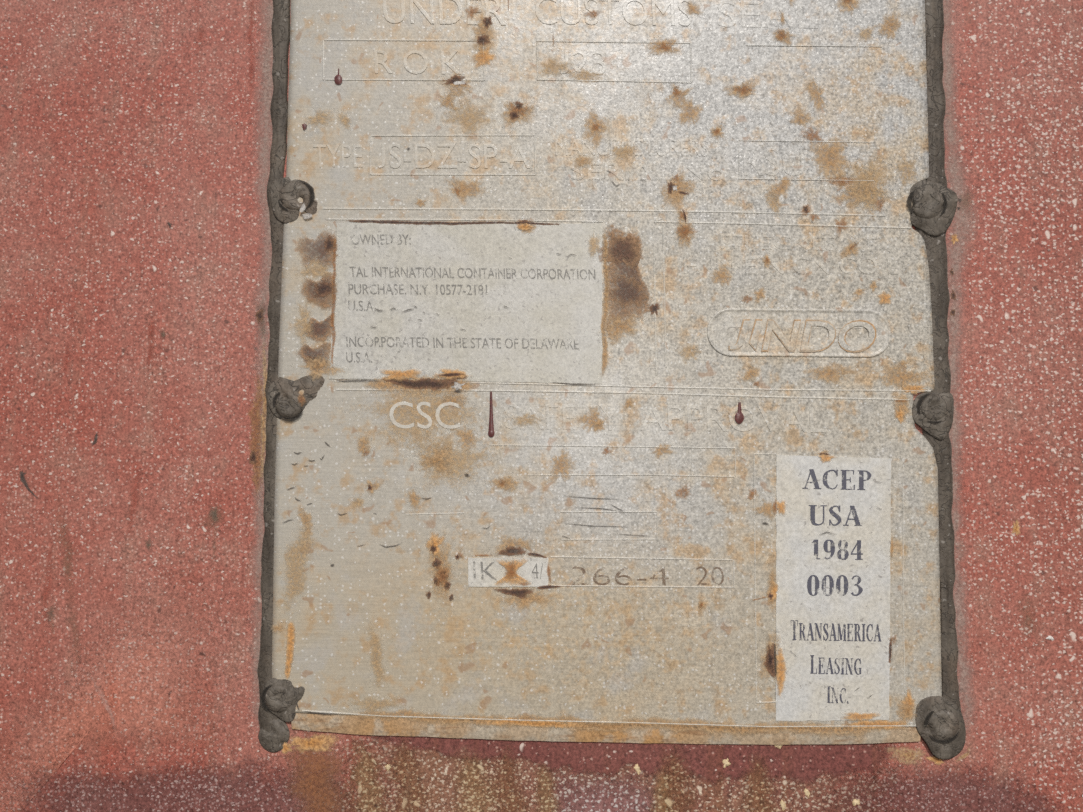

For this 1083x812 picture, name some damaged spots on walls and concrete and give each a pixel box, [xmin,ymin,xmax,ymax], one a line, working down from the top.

rust [467,8,494,66]
rust [650,39,678,53]
rust [774,13,792,44]
rust [440,73,490,131]
rust [504,101,532,123]
rust [669,84,702,122]
rust [792,82,886,212]
rust [349,220,559,232]
rust [663,175,694,245]
rust [368,369,481,478]
rust [426,535,461,601]
rust [475,538,561,608]